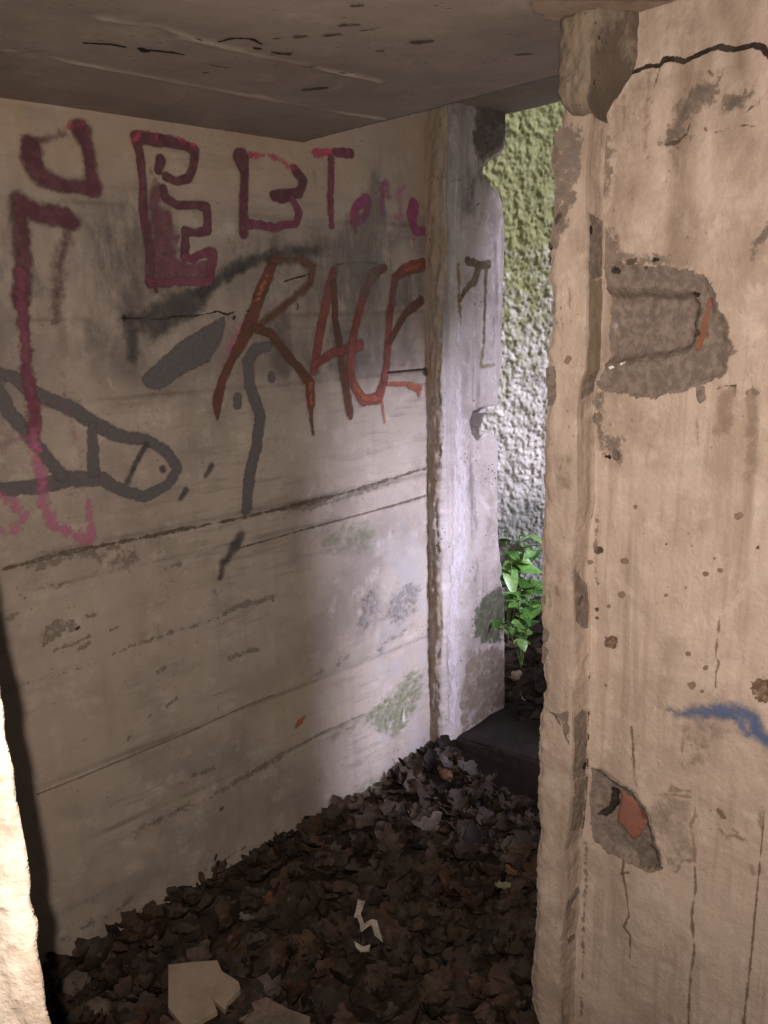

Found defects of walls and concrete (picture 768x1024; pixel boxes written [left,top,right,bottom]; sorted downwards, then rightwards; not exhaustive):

crack [631,42,768,86]
spalling [546,7,736,463]
spalling [750,678,768,703]
spalling [550,710,663,921]